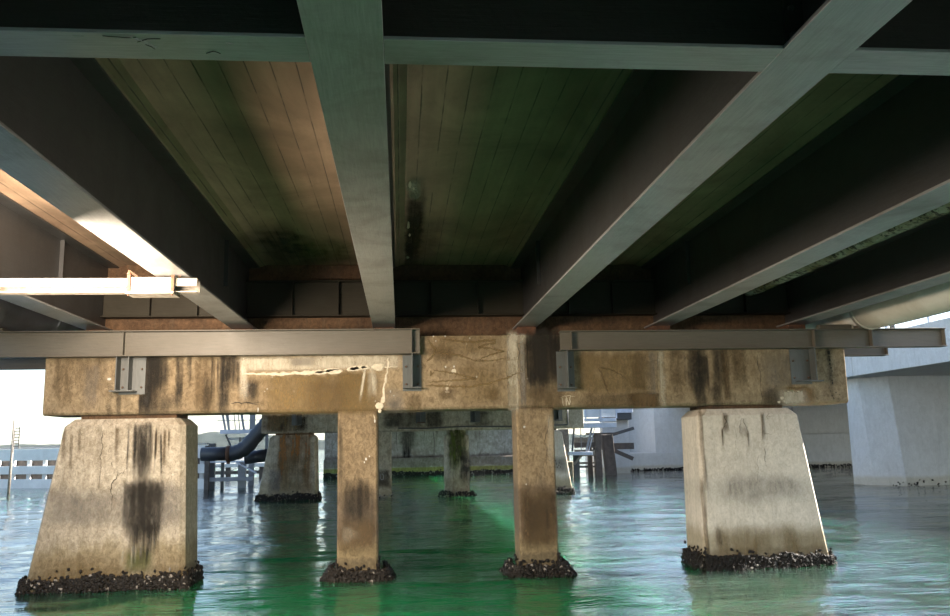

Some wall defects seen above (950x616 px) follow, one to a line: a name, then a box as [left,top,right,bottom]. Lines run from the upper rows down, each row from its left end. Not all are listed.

damp [406,198,424,258]
damp [139,357,191,412]
damp [197,356,236,410]
damp [245,369,375,429]
damp [515,330,560,407]
damp [672,350,745,441]
damp [127,424,170,474]
damp [701,469,709,554]